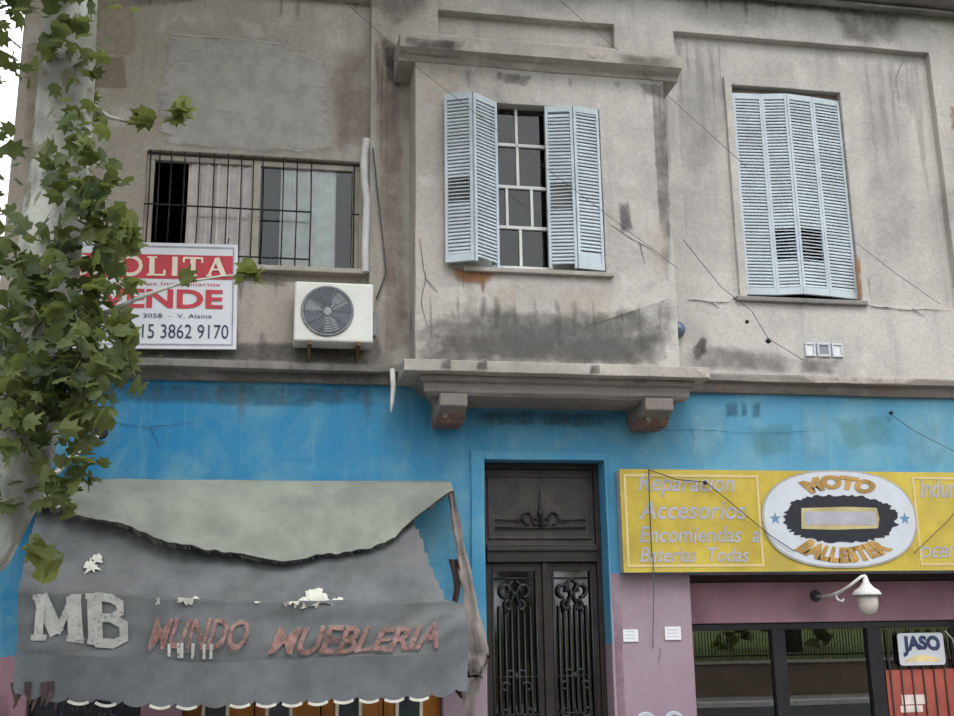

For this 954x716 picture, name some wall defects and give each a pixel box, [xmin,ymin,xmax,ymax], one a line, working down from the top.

crack [419,239,438,327]
rust [456,269,490,290]
damp [437,311,661,364]